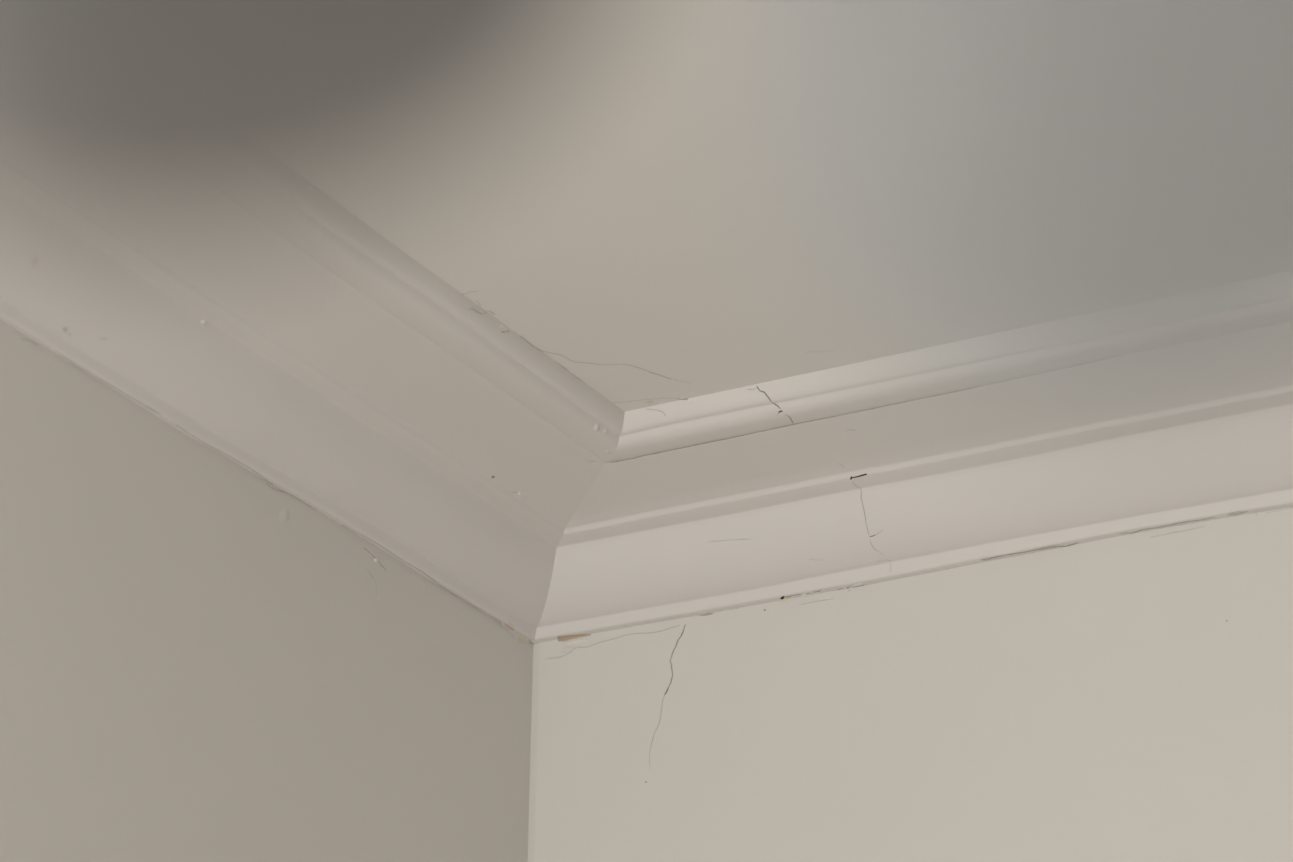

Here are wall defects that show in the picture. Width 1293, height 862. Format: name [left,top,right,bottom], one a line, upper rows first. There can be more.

crack [614,385,968,462]
crack [839,463,891,572]
crack [546,624,686,764]